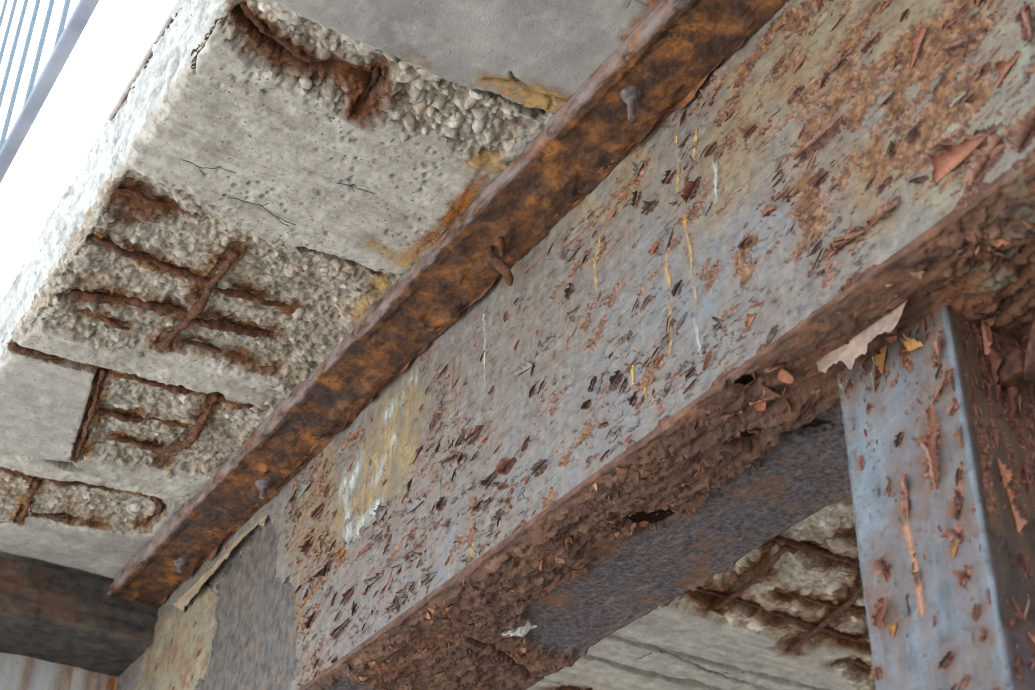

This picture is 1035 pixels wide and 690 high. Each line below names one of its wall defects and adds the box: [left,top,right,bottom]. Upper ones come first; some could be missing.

corrosion [234,4,395,128]
spalling [218,0,549,162]
corrosion [476,77,570,112]
corrosion [105,178,199,226]
crack [181,159,296,226]
corrosion [367,148,509,267]
corrosion [74,367,153,458]
corrosion [123,241,278,352]
spalling [3,166,404,479]
peeling [284,0,1035,690]
corrosion [721,365,795,422]
spalling [0,467,168,534]